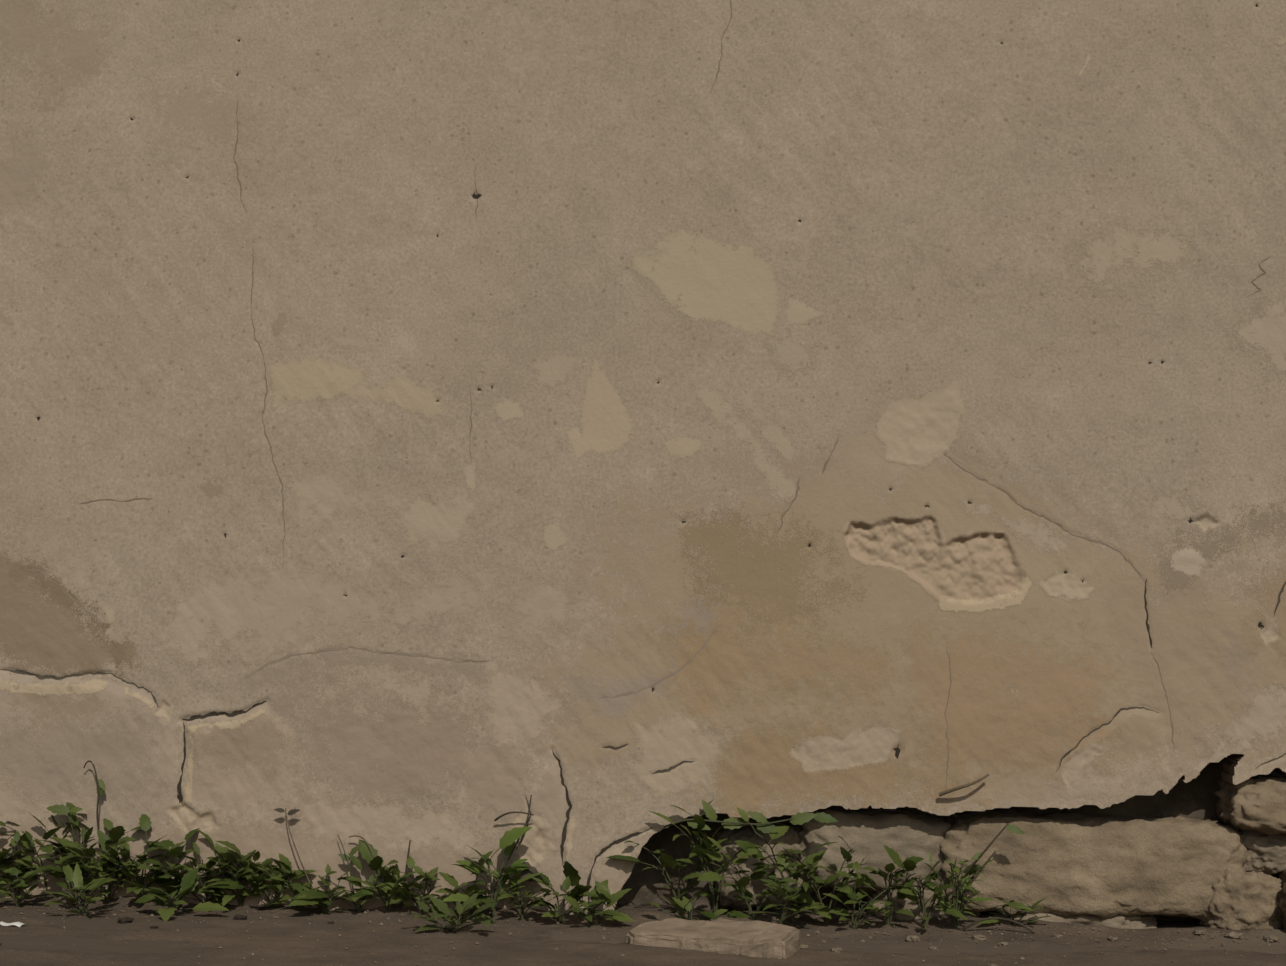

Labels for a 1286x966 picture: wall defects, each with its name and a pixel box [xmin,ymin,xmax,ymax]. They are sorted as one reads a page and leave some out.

crack [251,249,285,564]
spalling [939,570,1095,614]
crack [943,453,1175,773]
crack [1274,582,1286,616]
crack [0,646,492,804]
leakage [0,549,603,915]
peeling [618,709,739,802]
spalling [787,721,902,773]
spalling [1058,743,1105,789]
peeling [1179,680,1286,784]
crack [515,797,532,851]
crack [552,750,653,914]